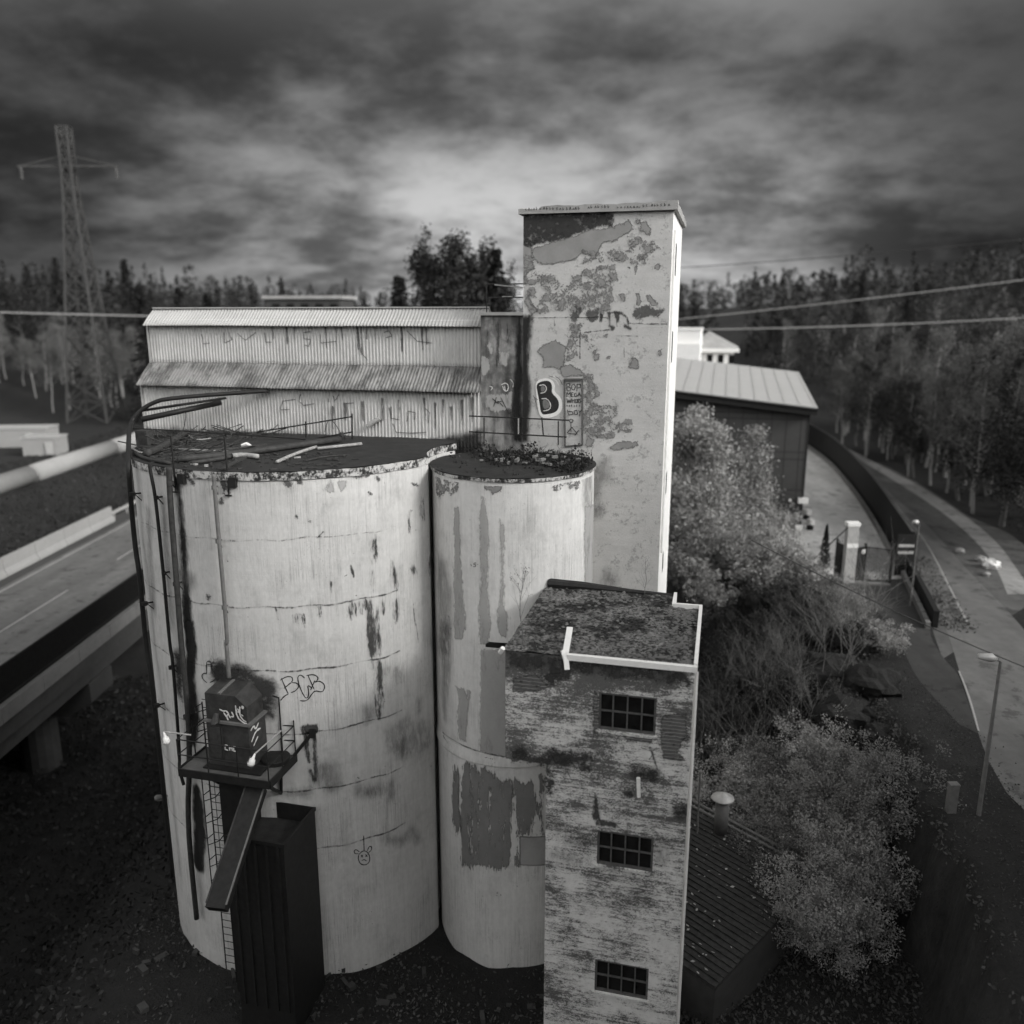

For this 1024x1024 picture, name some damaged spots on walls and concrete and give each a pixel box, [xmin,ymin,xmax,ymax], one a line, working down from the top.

water stain [511,315,533,442]
flaking render [523,219,664,450]
water stain [173,478,200,746]
water stain [453,496,691,795]
water stain [192,785,206,872]
peeling [452,761,545,871]